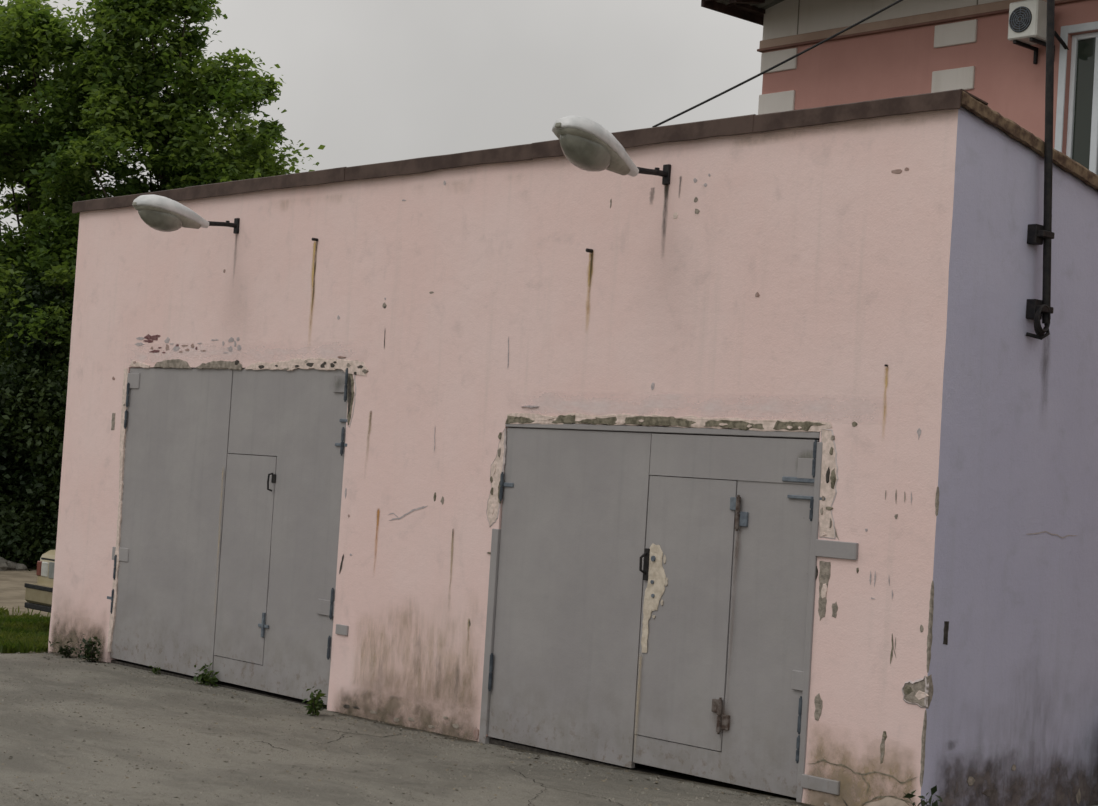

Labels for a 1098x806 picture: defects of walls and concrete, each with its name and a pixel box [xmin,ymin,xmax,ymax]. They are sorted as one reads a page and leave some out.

spalling [107,334,368,652]
spalling [486,405,839,539]
peeling [641,543,668,653]
spalling [815,561,838,620]
water stain [342,690,472,739]
spalling [902,581,949,787]
water stain [809,745,913,806]
crack [810,759,916,806]